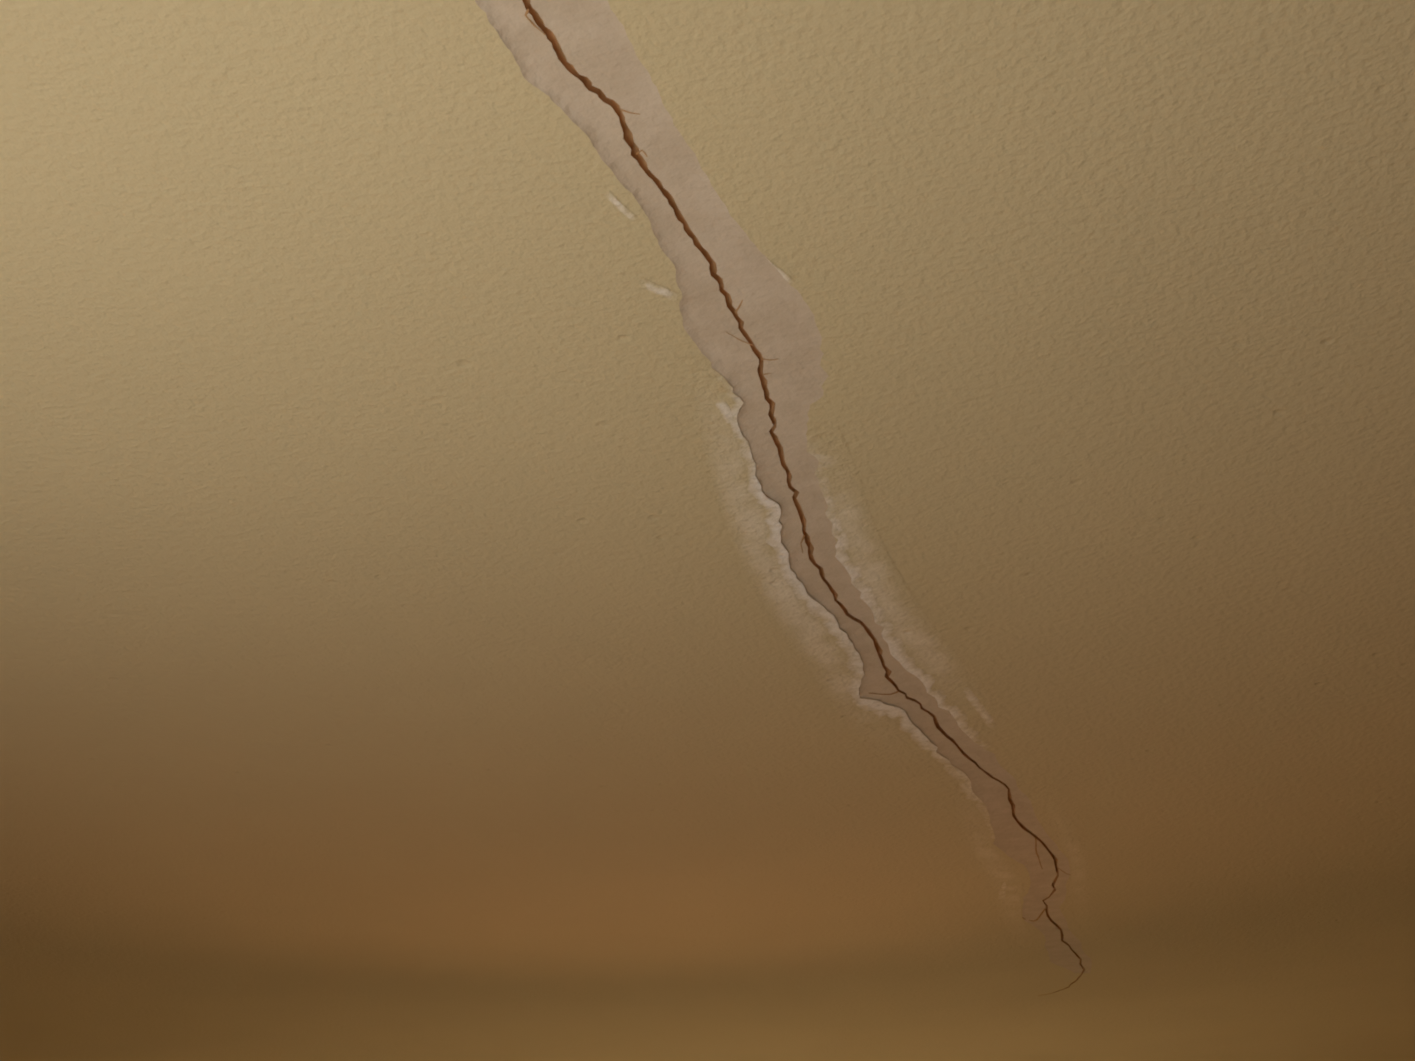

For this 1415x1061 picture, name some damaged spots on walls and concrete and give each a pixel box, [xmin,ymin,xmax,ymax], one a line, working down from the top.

spalling [475,0,1104,973]
crack [522,0,1085,996]